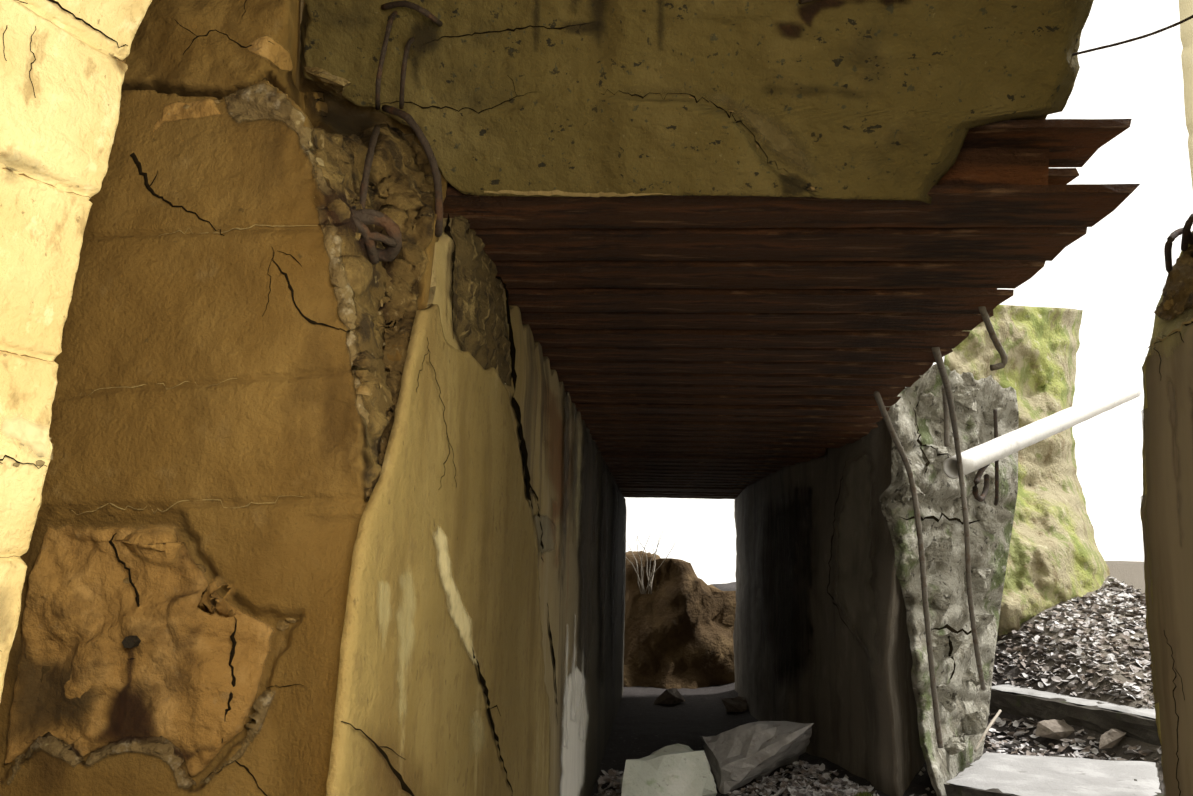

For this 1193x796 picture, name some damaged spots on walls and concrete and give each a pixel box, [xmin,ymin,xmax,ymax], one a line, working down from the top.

crack [3,0,128,98]
crack [368,75,531,114]
crack [422,21,596,46]
crack [130,152,347,332]
rust [323,189,393,283]
spalling [1148,244,1193,348]
crack [1146,321,1193,375]
peeling [153,83,556,796]
spalling [4,524,297,789]
crack [341,721,414,796]
crack [472,648,513,793]